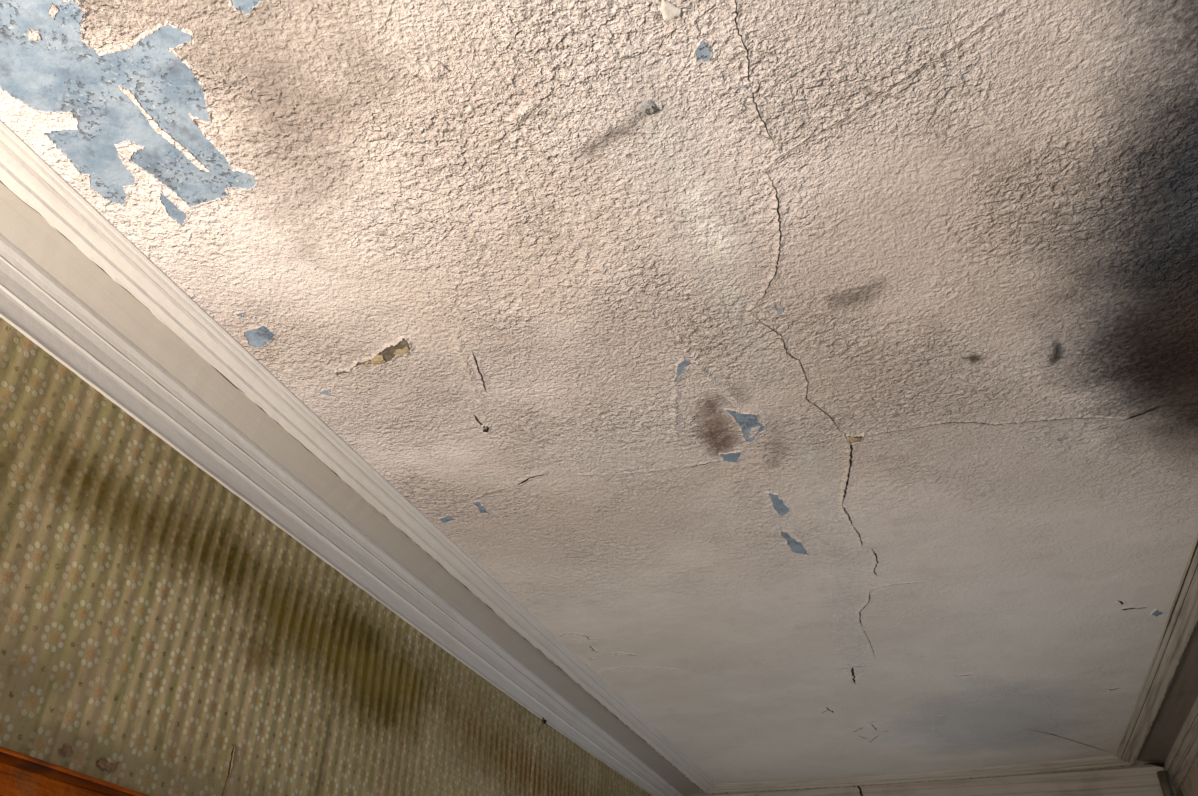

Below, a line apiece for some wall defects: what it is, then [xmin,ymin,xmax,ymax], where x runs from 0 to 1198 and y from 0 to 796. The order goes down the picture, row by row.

peeling [227,0,272,17]
peeling [659,0,681,21]
peeling [0,0,260,227]
leakage [1085,0,1198,437]
flaking render [318,335,414,396]
crack [468,352,491,429]
crack [728,0,1198,684]
peeling [718,408,767,464]
crack [471,458,720,501]
peeling [765,491,810,556]
leakage [62,459,434,729]